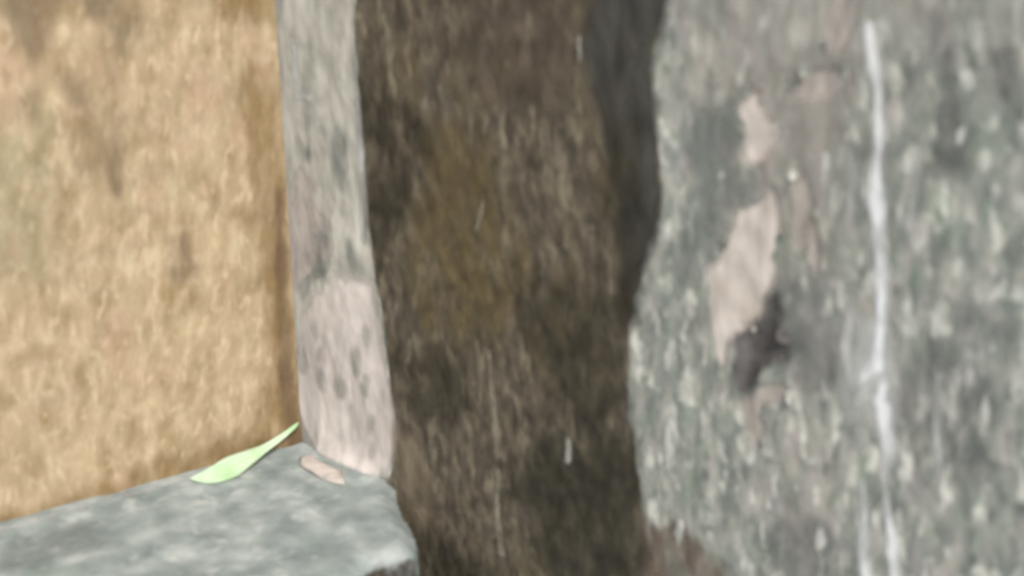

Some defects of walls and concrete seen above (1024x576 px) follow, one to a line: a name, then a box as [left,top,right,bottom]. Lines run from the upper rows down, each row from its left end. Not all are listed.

peeling [787,62,851,98]
peeling [737,83,778,163]
damp [841,21,893,479]
peeling [710,169,819,447]
damp [860,494,870,576]
damp [885,503,899,576]